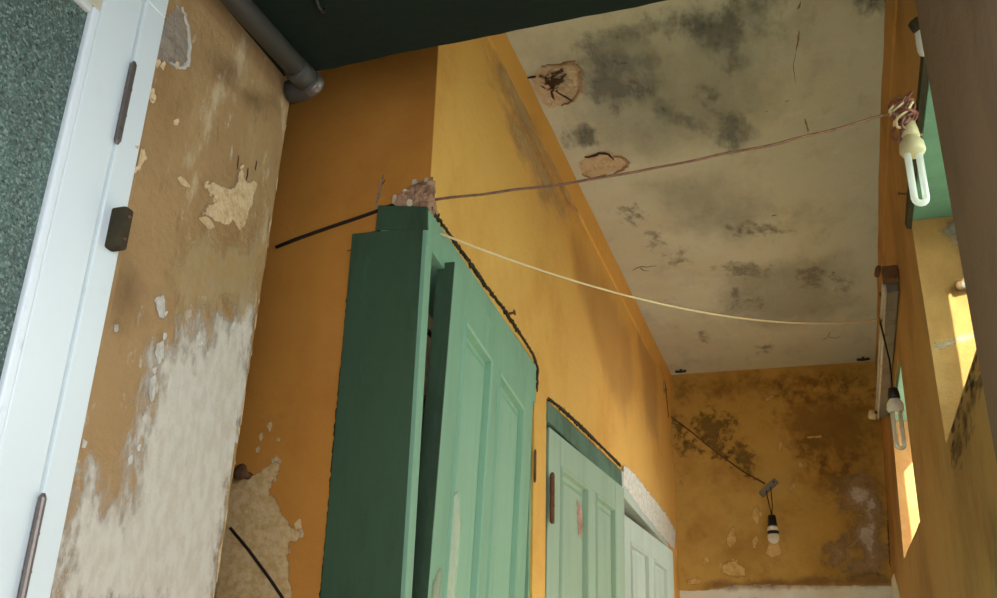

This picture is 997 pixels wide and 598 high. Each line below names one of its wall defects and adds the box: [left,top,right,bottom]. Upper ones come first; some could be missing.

flaking render [156,4,192,70]
flaking render [527,61,583,109]
damp [588,32,691,126]
damp [578,126,595,145]
peeling [198,165,258,230]
flaking render [392,176,539,392]
damp [933,334,974,348]
peeling [52,294,304,598]
peeling [547,397,676,549]
damp [672,409,755,480]
damp [951,355,982,469]
damp [822,472,889,576]